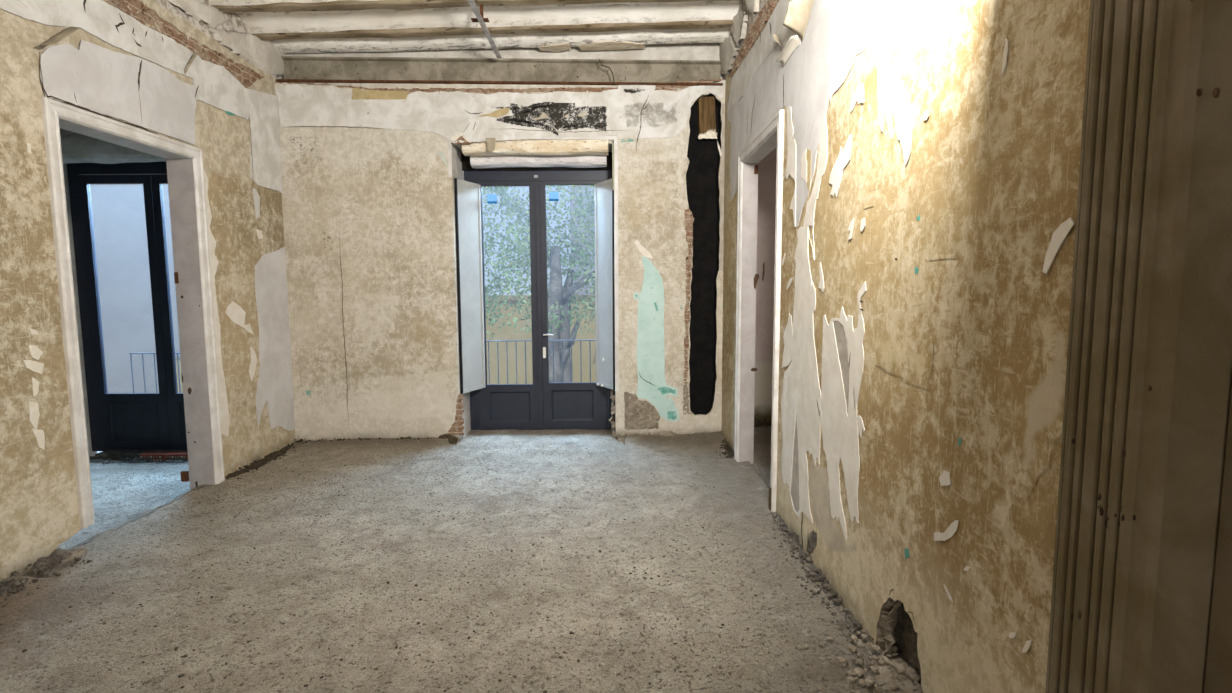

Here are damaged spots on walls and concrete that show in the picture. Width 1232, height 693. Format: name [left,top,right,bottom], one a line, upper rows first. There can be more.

crack [115,13,163,47]
flaking render [103,0,618,94]
flaking render [450,133,473,145]
peeling [833,321,849,414]
flaking render [1009,315,1075,501]
flaking render [779,415,859,559]
spalling [876,589,921,685]